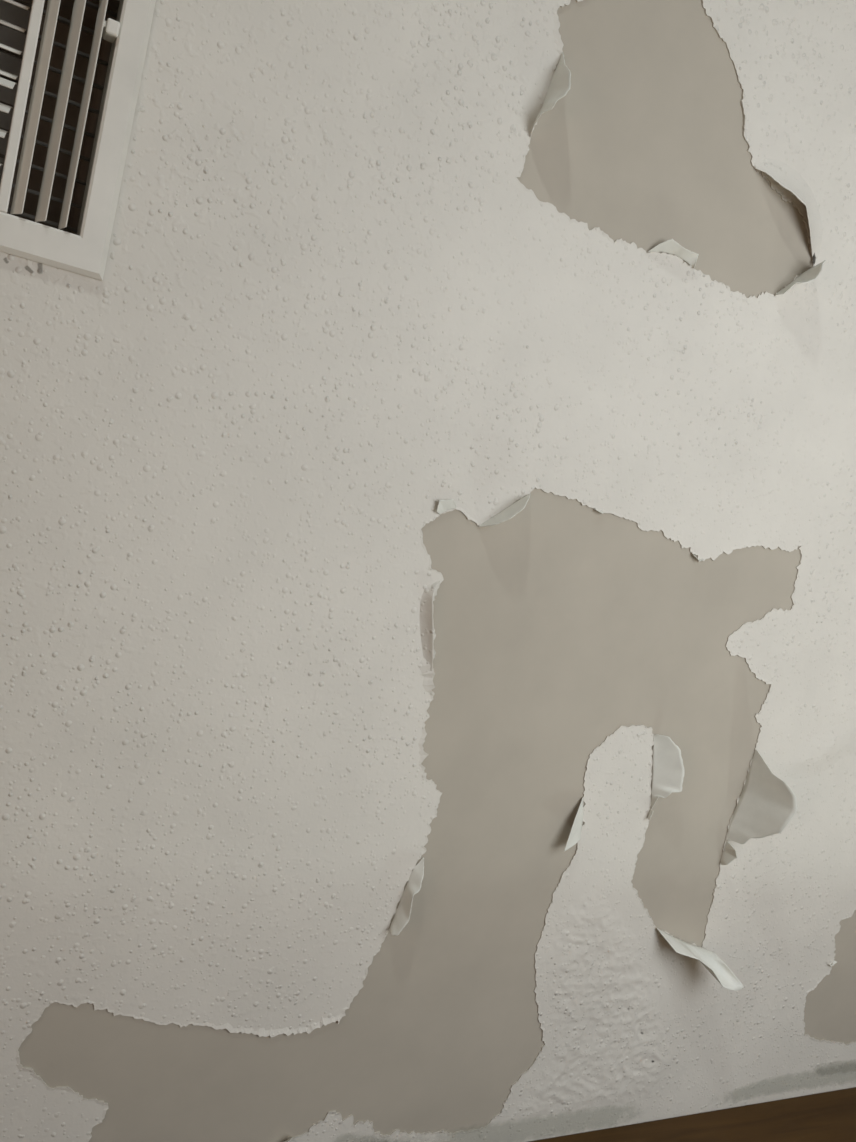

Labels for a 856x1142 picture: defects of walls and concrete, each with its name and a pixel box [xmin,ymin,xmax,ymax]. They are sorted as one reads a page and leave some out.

peeling [515,0,826,300]
peeling [15,485,803,1142]
peeling [802,908,856,1047]